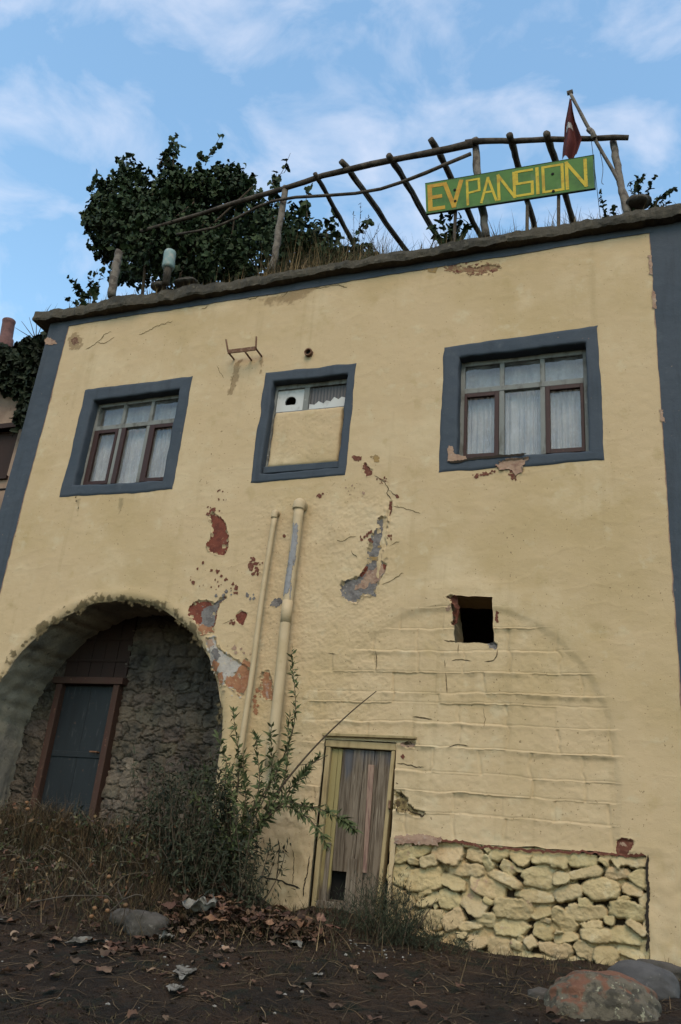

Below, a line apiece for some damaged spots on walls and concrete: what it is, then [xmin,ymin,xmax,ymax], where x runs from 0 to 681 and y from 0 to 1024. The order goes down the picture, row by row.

peeling [427,261,502,276]
crack [345,454,419,513]
flaking render [447,446,467,461]
flaking render [472,457,529,481]
peeling [270,523,298,608]
flaking render [340,502,392,605]
peeling [188,489,273,715]
flaking render [393,782,426,817]
flaking render [394,833,645,858]